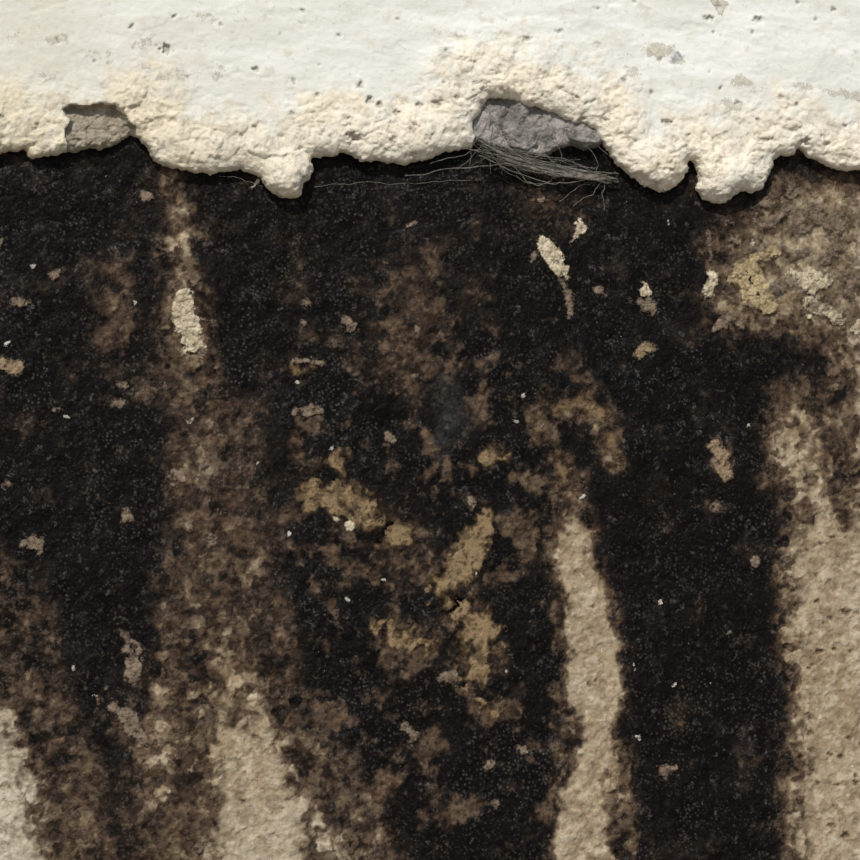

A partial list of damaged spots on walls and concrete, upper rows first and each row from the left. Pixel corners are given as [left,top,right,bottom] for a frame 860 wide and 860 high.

spalling [63,103,137,153]
spalling [473,98,603,159]
water stain [704,149,860,308]
water stain [736,298,860,532]
water stain [0,136,817,860]